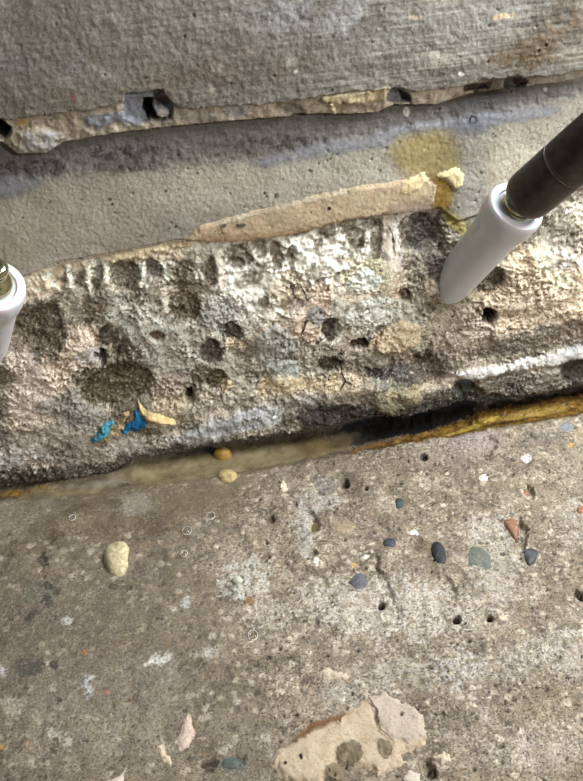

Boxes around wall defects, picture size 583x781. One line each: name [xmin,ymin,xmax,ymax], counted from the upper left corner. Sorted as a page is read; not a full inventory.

spalling [85,89,174,127]
spalling [0,167,583,486]
rust [347,391,583,454]
peeling [271,691,427,781]